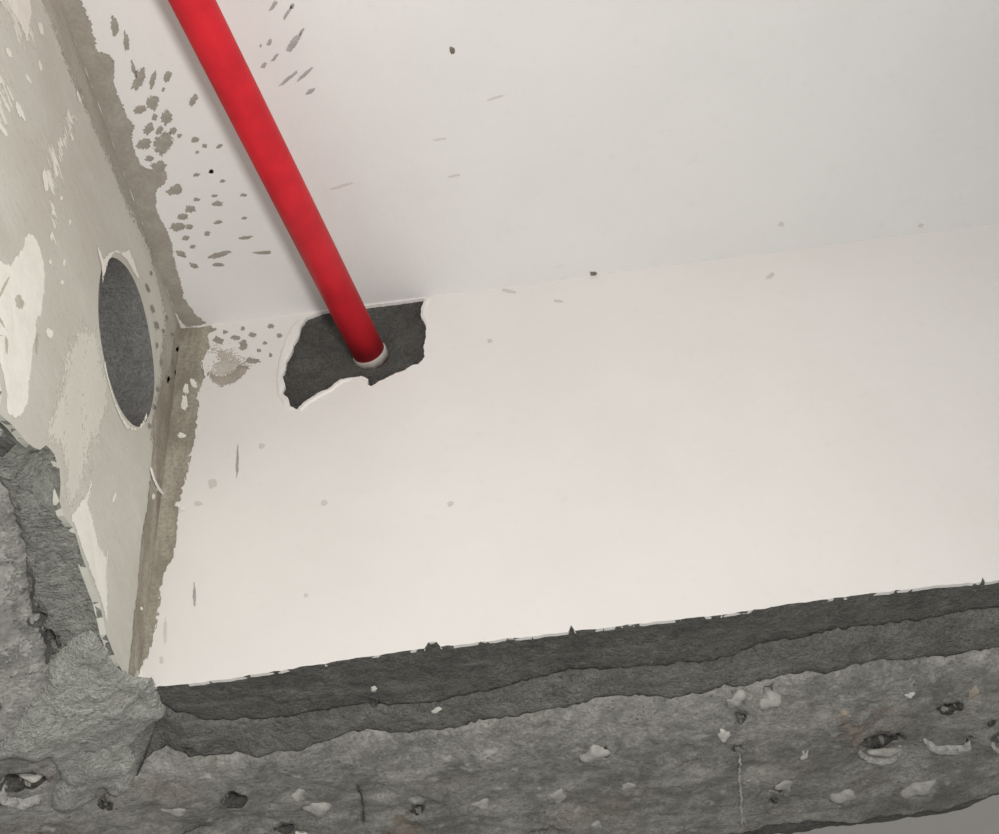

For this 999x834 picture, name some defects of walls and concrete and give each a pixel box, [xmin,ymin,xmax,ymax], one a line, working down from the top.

spalling [150,305,174,348]
spalling [276,297,431,411]
spalling [0,233,153,742]
spalling [0,578,999,834]